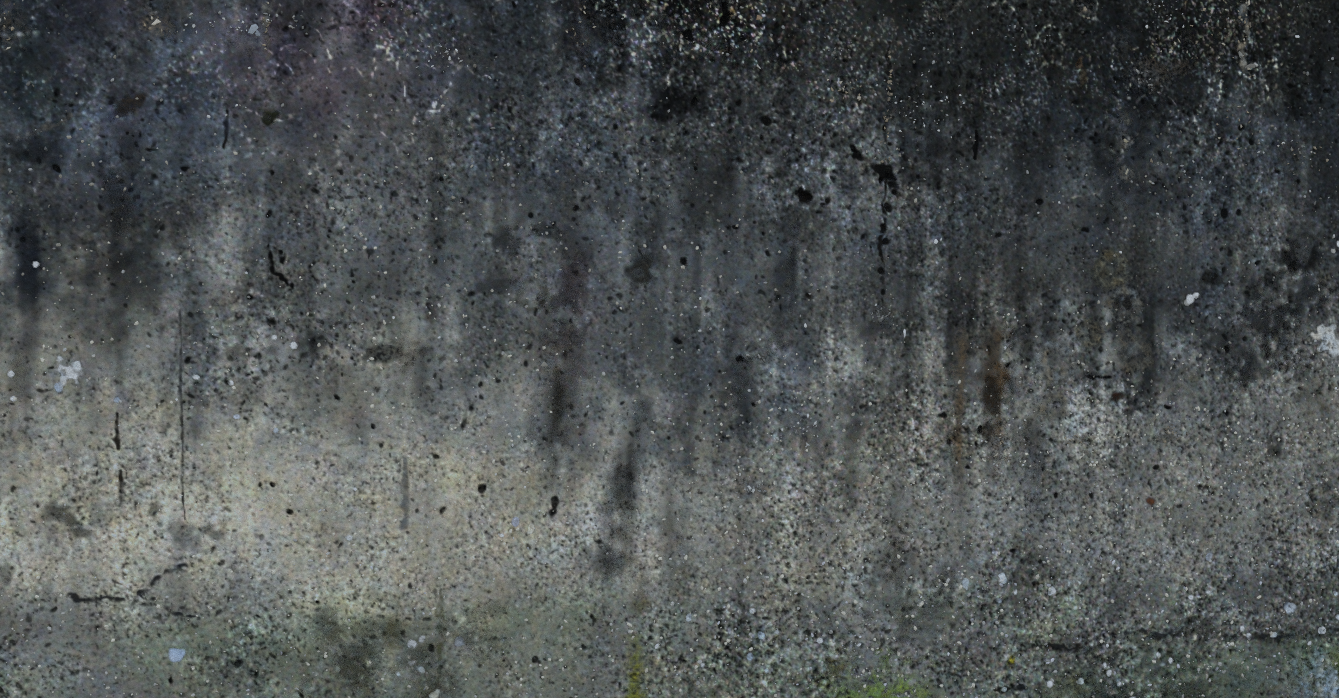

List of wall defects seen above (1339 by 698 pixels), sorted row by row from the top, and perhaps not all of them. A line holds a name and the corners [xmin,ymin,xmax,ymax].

leakage [1244,251,1318,336]
leakage [367,344,402,363]
leakage [552,382,563,439]
corrosion [982,329,1002,442]
leakage [617,442,635,509]